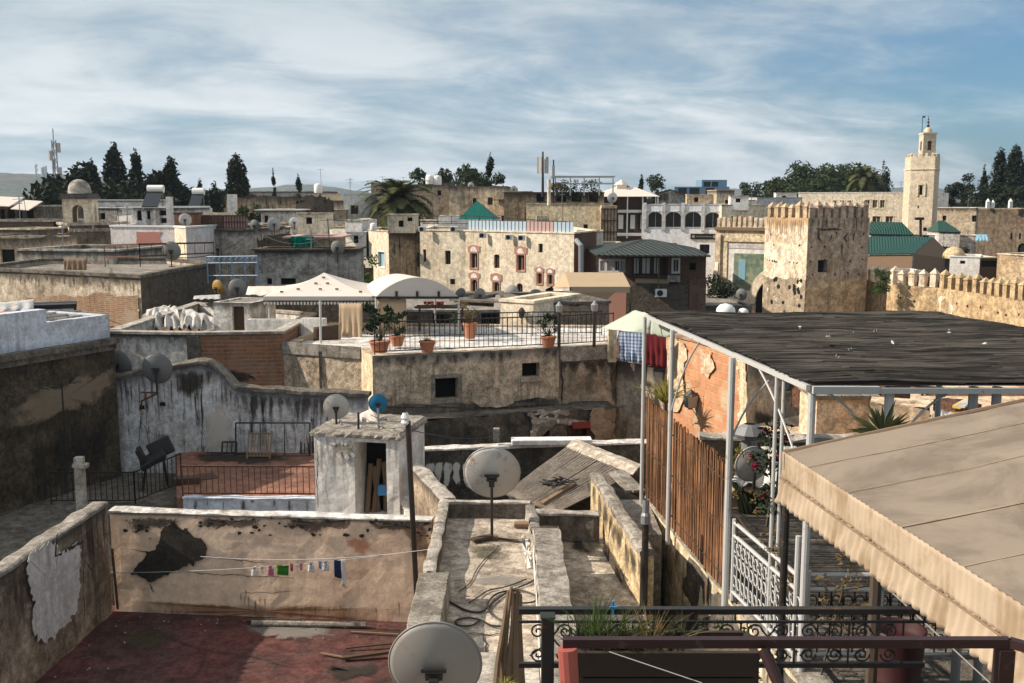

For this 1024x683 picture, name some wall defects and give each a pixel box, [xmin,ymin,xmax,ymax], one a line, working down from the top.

leakage [120,371,211,422]
leakage [230,370,249,382]
leakage [199,389,283,464]
leakage [245,395,324,421]
spalling [379,397,616,440]
peeling [123,517,432,554]
peeling [26,541,82,643]